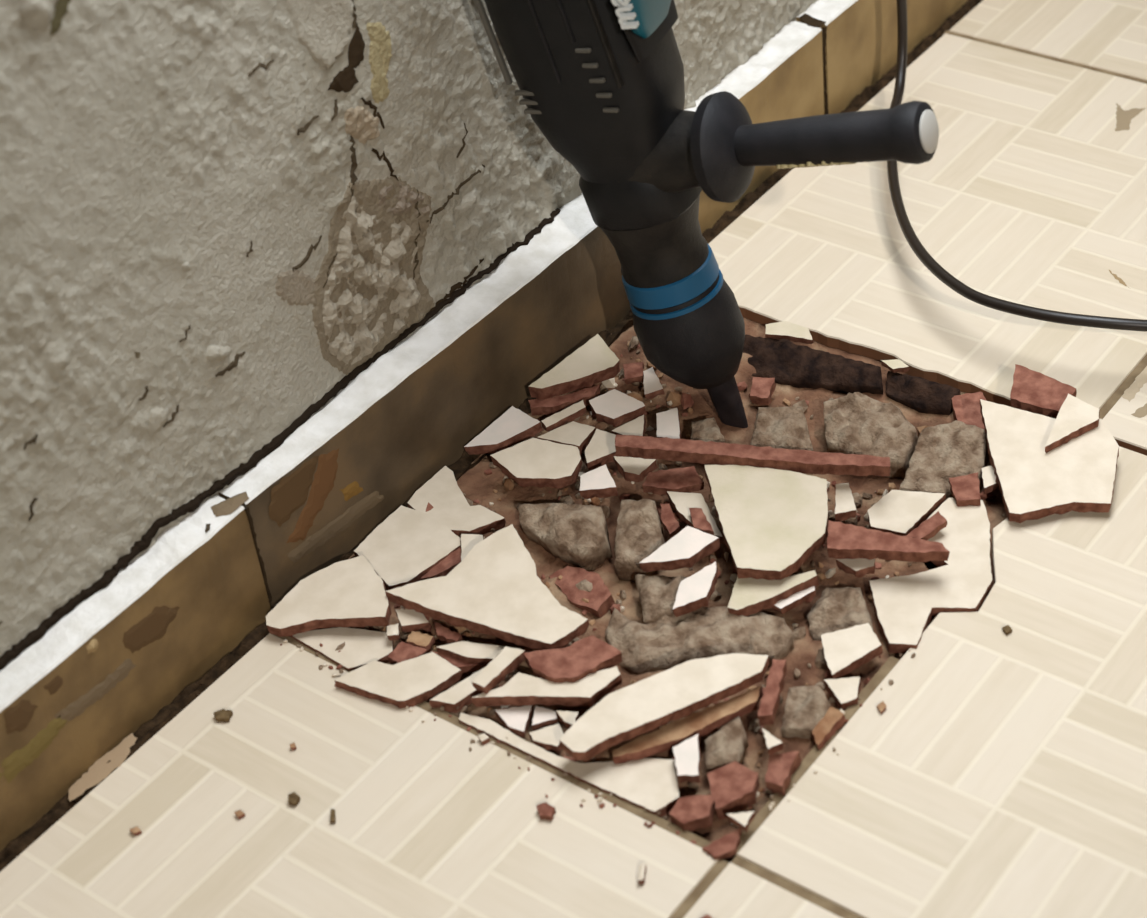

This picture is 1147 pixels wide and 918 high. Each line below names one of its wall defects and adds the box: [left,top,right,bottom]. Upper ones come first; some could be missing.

crack [350,0,358,28]
crack [248,59,274,77]
peeling [454,188,477,214]
peeling [312,176,435,375]